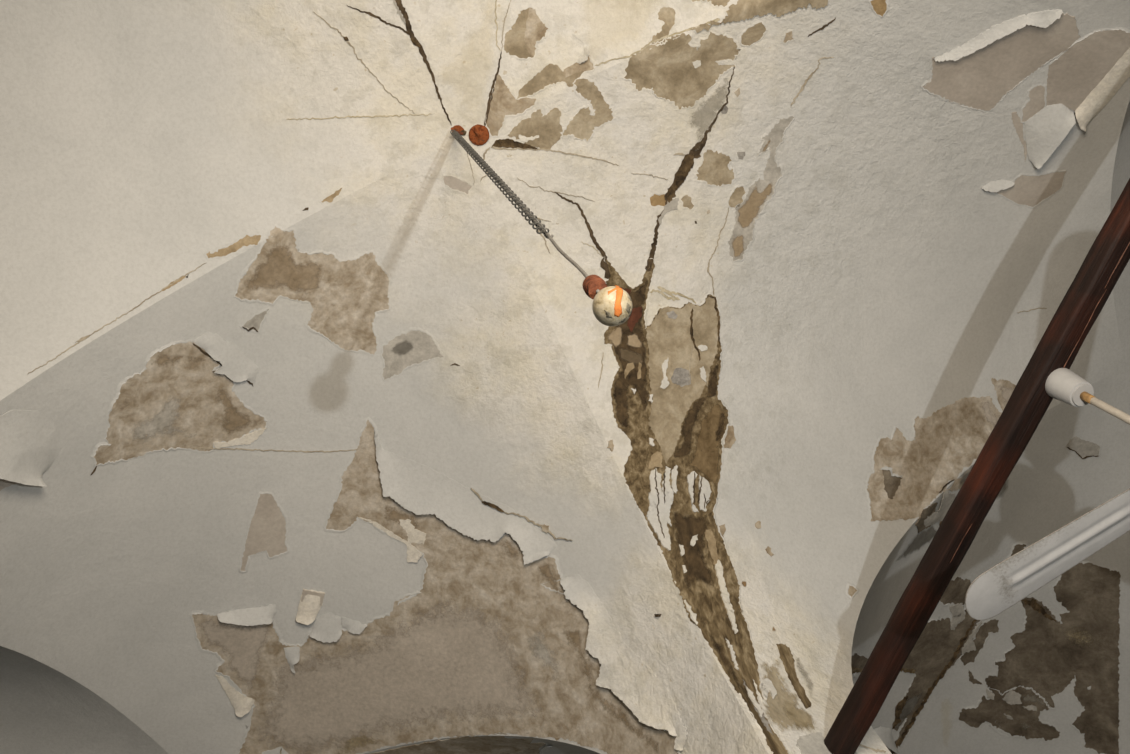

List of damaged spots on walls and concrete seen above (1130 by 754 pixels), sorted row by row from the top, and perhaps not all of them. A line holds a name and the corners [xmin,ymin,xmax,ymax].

crack [287,0,452,126]
peeling [483,5,616,150]
crack [467,0,735,304]
peeling [622,0,830,111]
peeling [920,9,1130,209]
peeling [204,224,446,382]
peeling [91,333,270,475]
peeling [864,378,1016,560]
peeling [189,417,682,754]
water stain [764,660,814,729]
peeling [851,650,869,678]
peeling [874,561,1123,754]